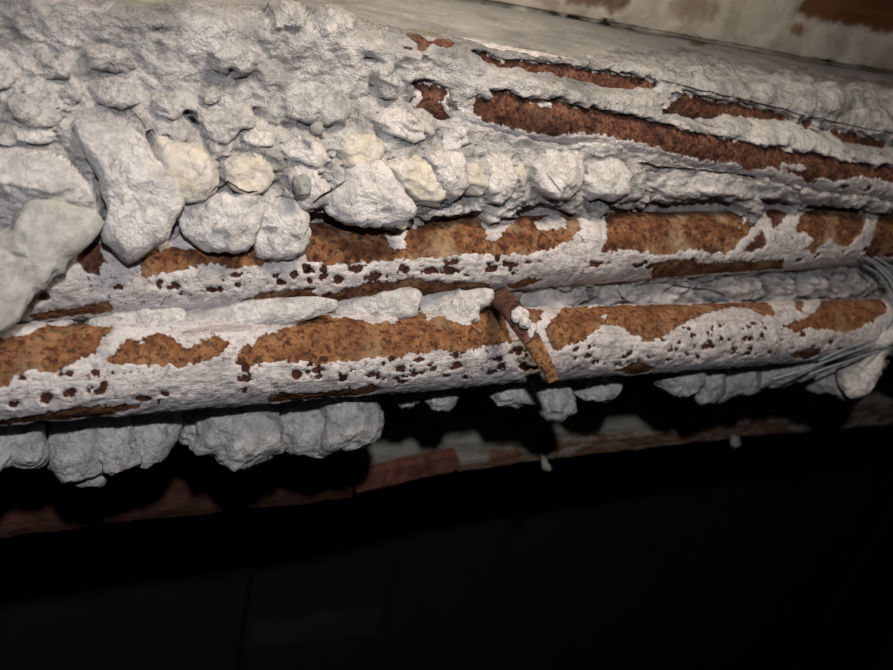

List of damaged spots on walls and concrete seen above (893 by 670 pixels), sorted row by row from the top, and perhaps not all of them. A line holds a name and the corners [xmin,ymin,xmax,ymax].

rust [412,82,450,120]
rust [478,52,656,90]
rust [473,90,893,191]
rust [136,247,276,295]
rust [243,214,581,302]
spalling [0,0,893,426]
rust [587,209,787,279]
rust [796,208,893,262]
rust [0,301,229,425]
rust [235,308,536,403]
rust [525,302,783,374]
rust [783,298,887,360]